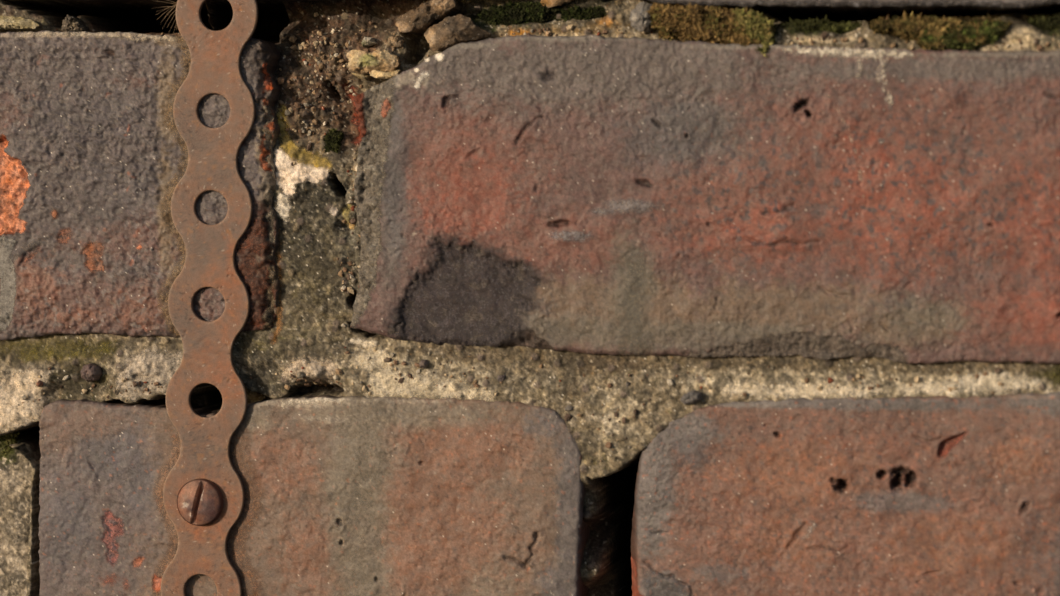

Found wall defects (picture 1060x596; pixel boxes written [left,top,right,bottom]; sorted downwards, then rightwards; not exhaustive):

spalling [0,134,30,235]
corrosion [159,36,191,337]
corrosion [237,212,282,342]
corrosion [227,442,263,596]